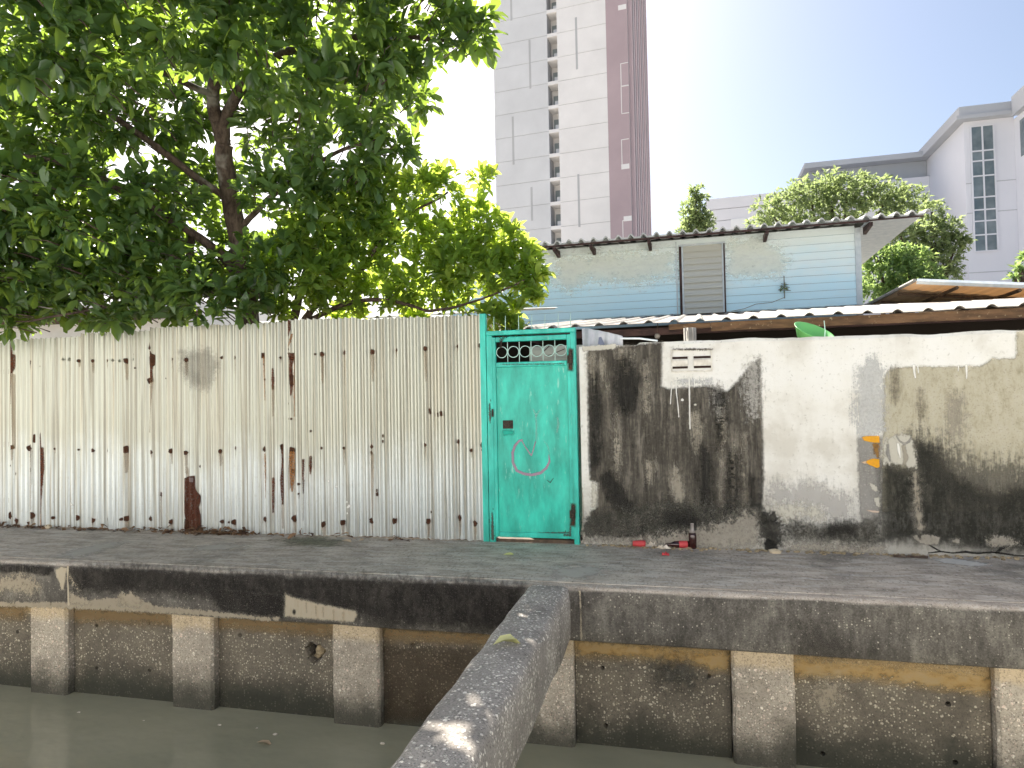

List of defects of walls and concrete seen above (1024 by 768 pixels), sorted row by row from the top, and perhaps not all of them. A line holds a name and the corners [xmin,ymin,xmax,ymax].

corrosion [147,343,166,384]
corrosion [8,434,56,526]
corrosion [263,444,323,522]
leakage [580,331,1024,566]
peeling [851,356,911,525]
leakage [0,564,524,632]
spalling [314,644,326,658]